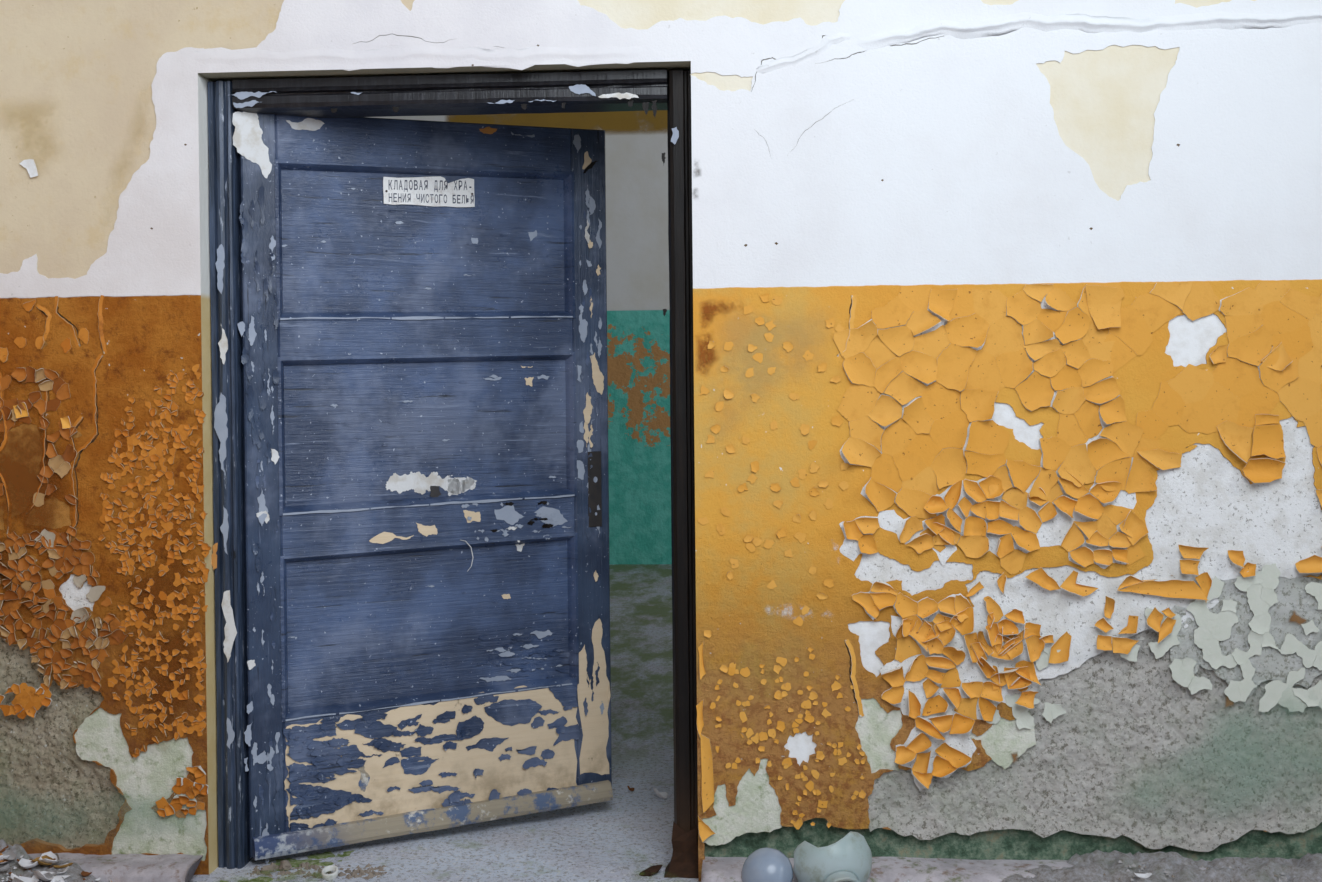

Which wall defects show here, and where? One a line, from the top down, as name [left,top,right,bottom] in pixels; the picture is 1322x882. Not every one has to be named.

peeling [0,0,284,279]
peeling [215,244,225,294]
peeling [227,91,287,303]
peeling [448,84,679,540]
peeling [578,0,845,30]
peeling [1036,45,1179,201]
spalling [0,328,237,861]
peeling [218,316,279,533]
peeling [369,523,438,544]
peeling [386,472,570,556]
spalling [696,281,1322,852]
peeling [227,612,611,837]